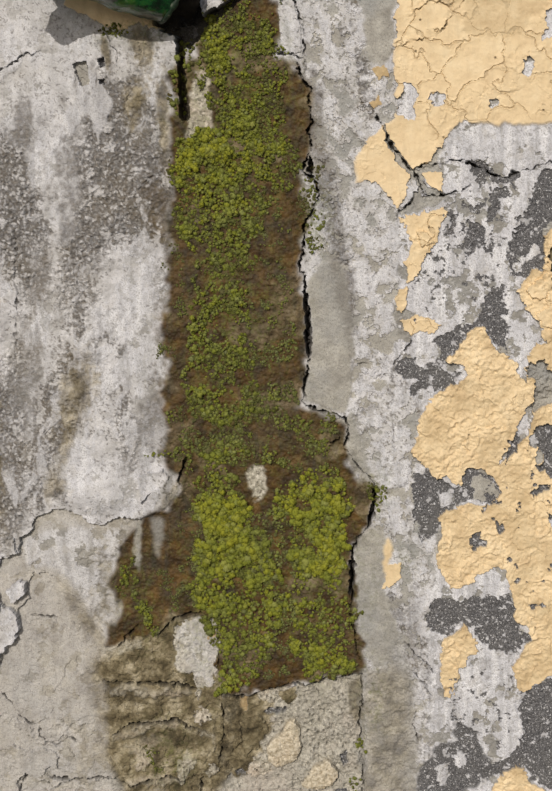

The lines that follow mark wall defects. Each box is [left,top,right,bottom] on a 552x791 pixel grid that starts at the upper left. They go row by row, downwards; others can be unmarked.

crack [0,51,39,71]
spalling [74,62,105,87]
spalling [154,0,241,121]
peeling [358,0,397,81]
peeling [396,83,419,121]
crack [398,0,465,49]
crack [373,109,552,219]
leakage [0,0,376,696]
crack [20,0,378,791]
peeling [382,121,552,791]
spalling [0,509,368,791]
crack [1,691,84,748]